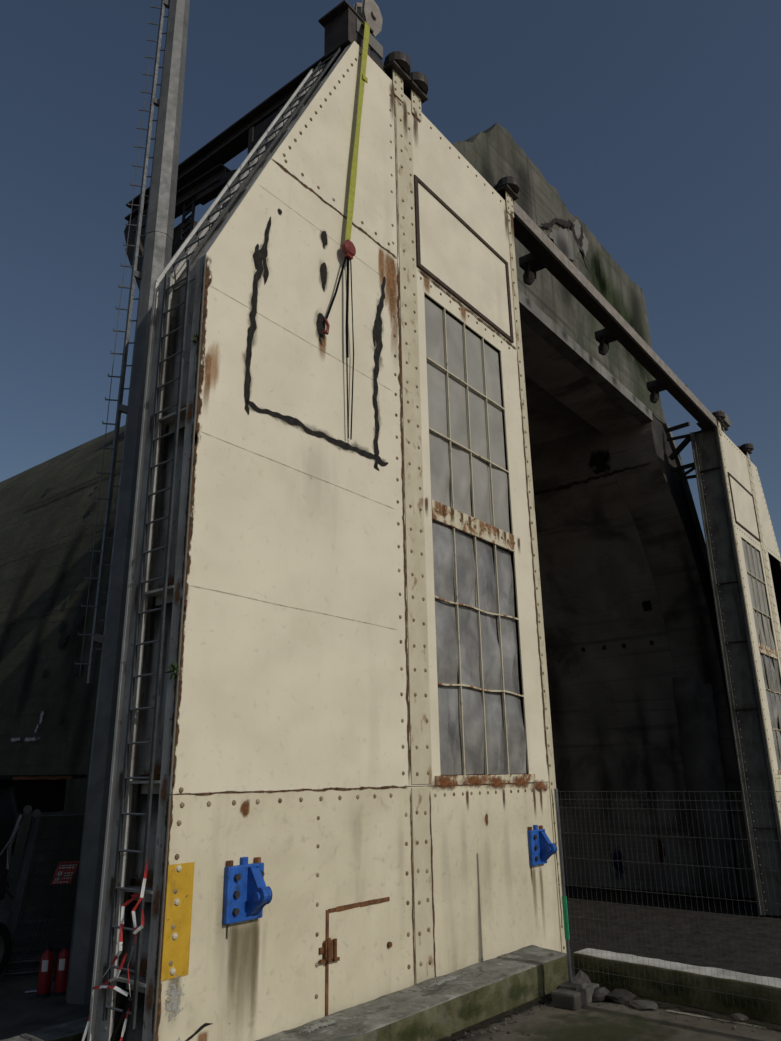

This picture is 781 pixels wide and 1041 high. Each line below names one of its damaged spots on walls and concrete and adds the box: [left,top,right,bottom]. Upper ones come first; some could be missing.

leakage [231,926,258,967]
rust [130,258,415,1041]
rust [274,85,418,771]
rust [420,270,516,349]
rust [426,362,562,977]